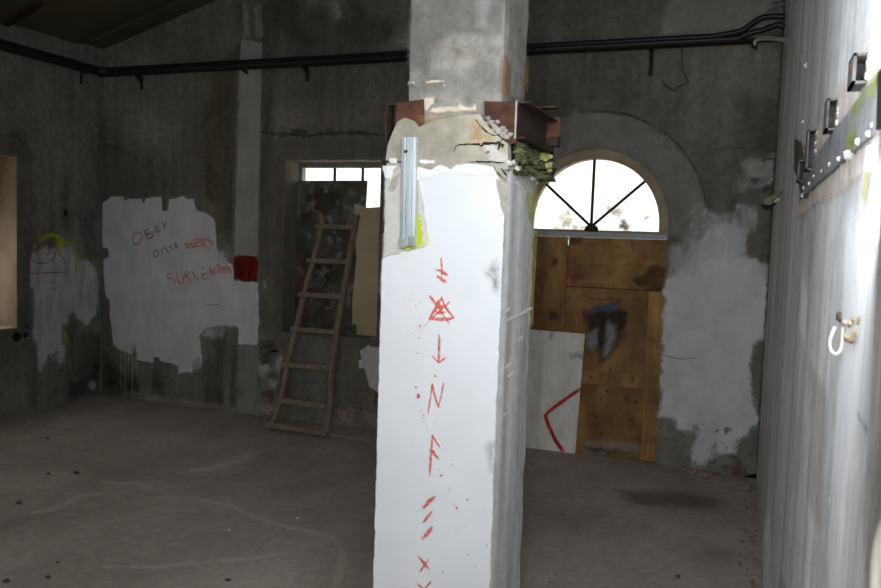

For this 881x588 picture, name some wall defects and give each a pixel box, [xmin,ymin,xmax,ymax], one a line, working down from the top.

peeling [383,158,399,191]
peeling [417,160,496,180]
spalling [508,140,553,185]